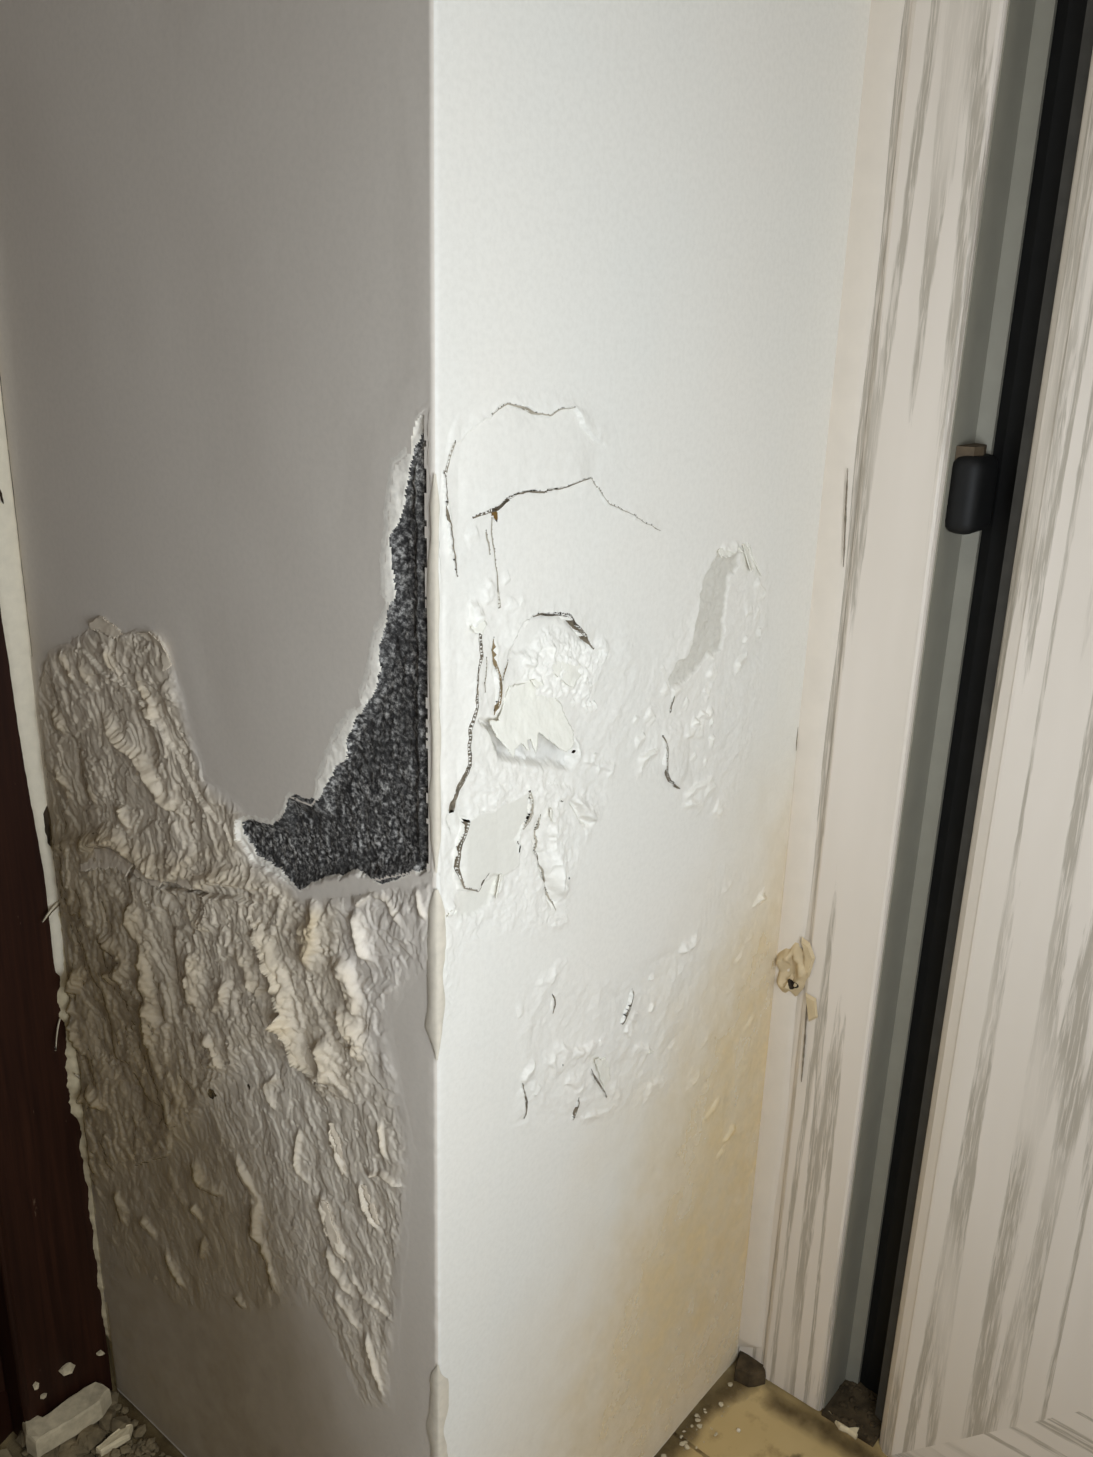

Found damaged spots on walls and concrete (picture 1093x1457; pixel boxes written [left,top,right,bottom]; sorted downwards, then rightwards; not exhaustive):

crack [492,403,575,416]
flaking render [31,403,777,1418]
crack [522,792,556,911]
crack [444,442,661,892]